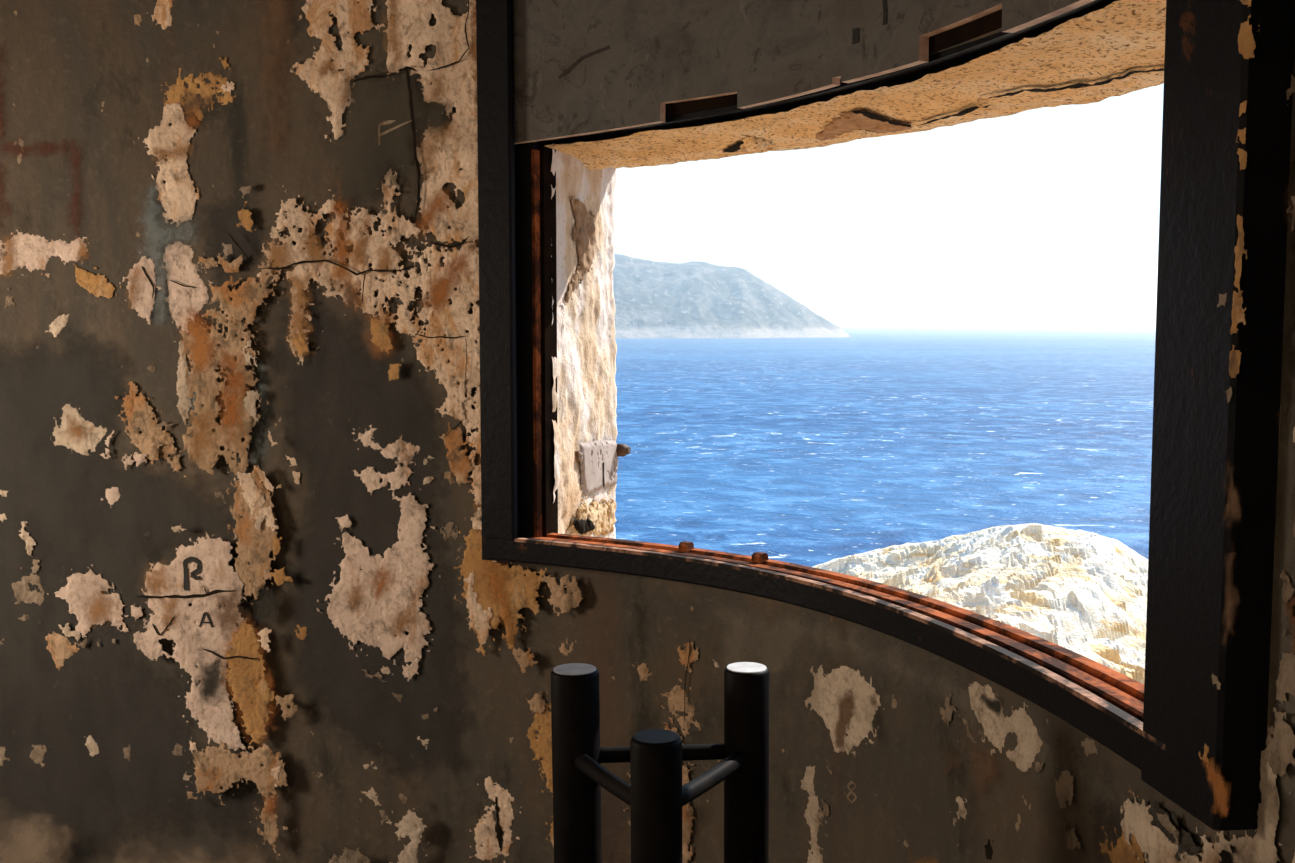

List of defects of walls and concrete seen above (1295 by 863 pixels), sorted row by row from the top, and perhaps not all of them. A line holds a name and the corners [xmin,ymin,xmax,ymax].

peeling [1238,0,1260,59]
crack [228,0,469,306]
peeling [1236,101,1247,170]
spalling [563,191,596,306]
peeling [1217,215,1247,403]
peeling [0,0,584,863]
corrosion [1226,483,1240,517]
peeling [805,665,881,755]
peeling [956,796,967,821]
peeling [940,681,1074,809]
peeling [1100,652,1295,863]
corrosion [1199,743,1228,815]